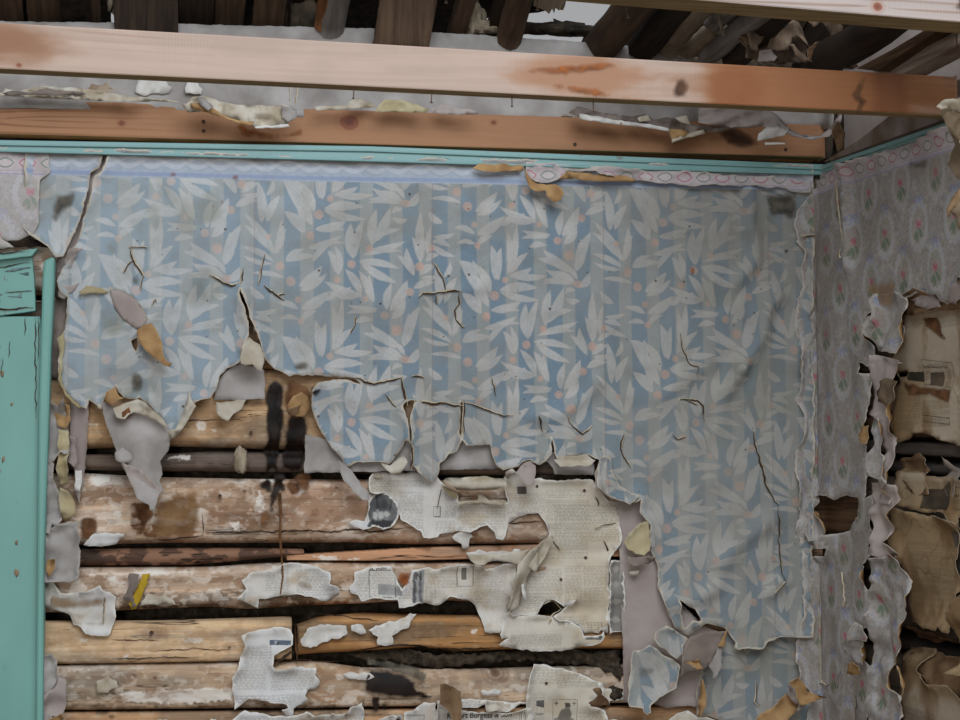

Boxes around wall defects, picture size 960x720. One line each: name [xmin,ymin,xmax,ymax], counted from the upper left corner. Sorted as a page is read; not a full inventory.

crack [419,262,465,327]
crack [680,334,699,374]
crack [355,375,513,437]
crack [678,398,705,419]
damp [260,381,320,524]
crack [408,445,416,470]
crack [620,434,631,467]
peeling [814,495,859,533]
peeling [623,521,651,556]
peeling [589,687,609,707]